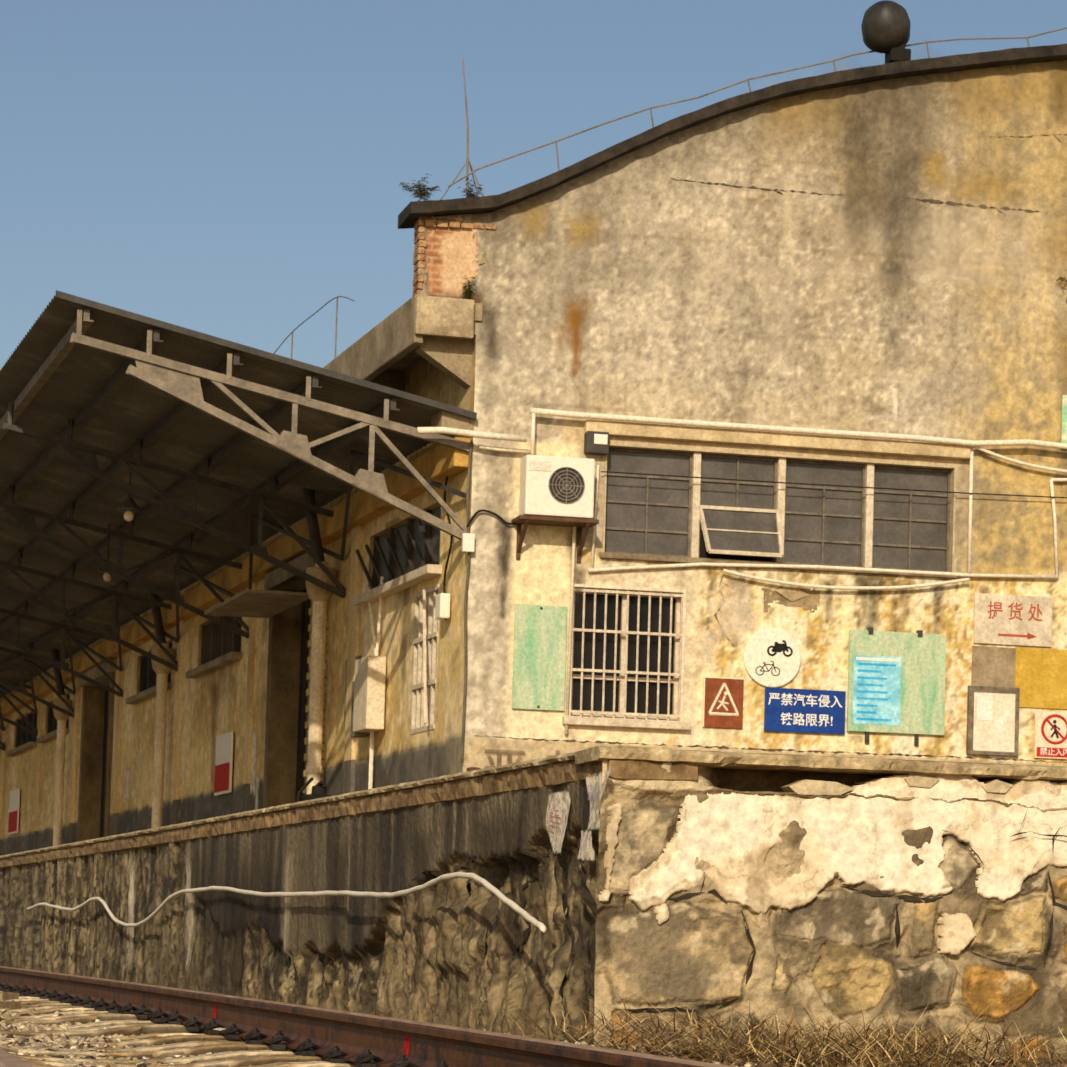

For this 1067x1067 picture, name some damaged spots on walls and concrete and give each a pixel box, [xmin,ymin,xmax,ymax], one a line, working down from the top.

crack [671,178,849,196]
crack [909,198,1040,214]
flaking render [423,216,485,298]
peeling [598,803,622,903]
peeling [629,774,1067,926]
peeling [937,913,976,956]